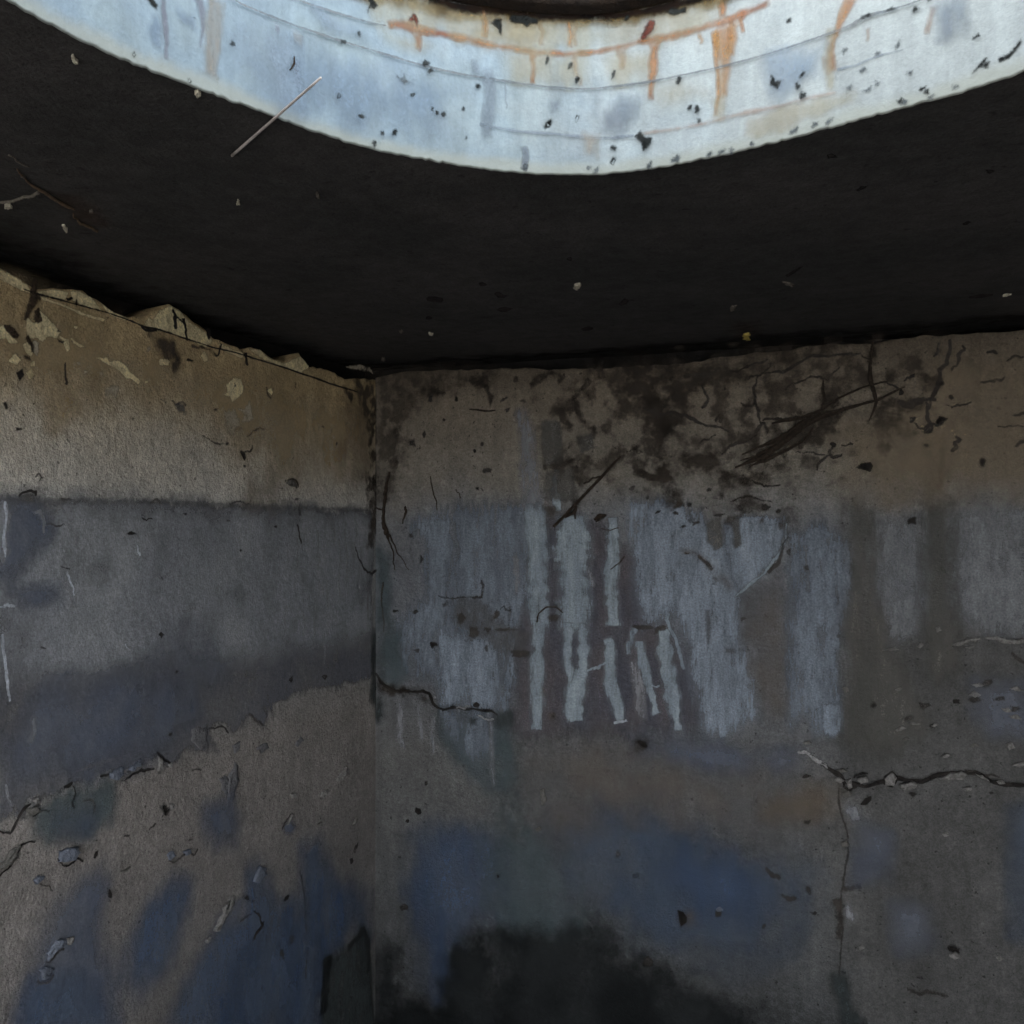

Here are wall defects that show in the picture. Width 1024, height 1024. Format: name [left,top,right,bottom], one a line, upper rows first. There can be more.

rust [374,0,766,107]
rust [829,0,853,68]
flaking render [0,270,308,380]
crack [643,352,861,455]
water stain [852,356,1024,479]
crack [880,339,1024,452]
water stain [417,343,868,796]
peeling [0,473,374,821]
crack [376,673,498,721]
water stain [821,503,925,755]
peeling [0,840,35,876]
crack [797,750,1024,973]